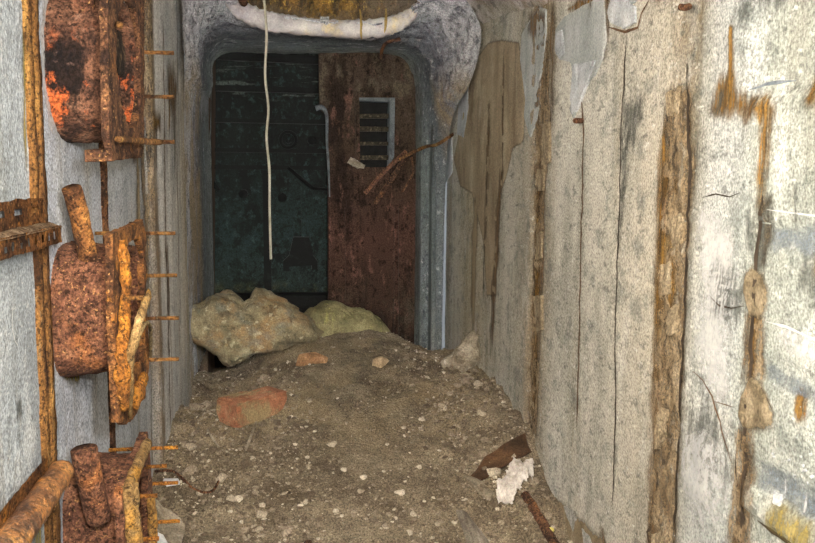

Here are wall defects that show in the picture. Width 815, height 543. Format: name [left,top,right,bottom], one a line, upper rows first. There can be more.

spalling [247,0,420,21]
peeling [665,86,682,116]
corrosion [711,26,775,206]
corrosion [806,80,815,107]
flaking render [445,0,649,295]
peeling [666,213,684,247]
peeling [660,261,672,296]
peeling [666,303,681,336]
spalling [738,376,773,430]